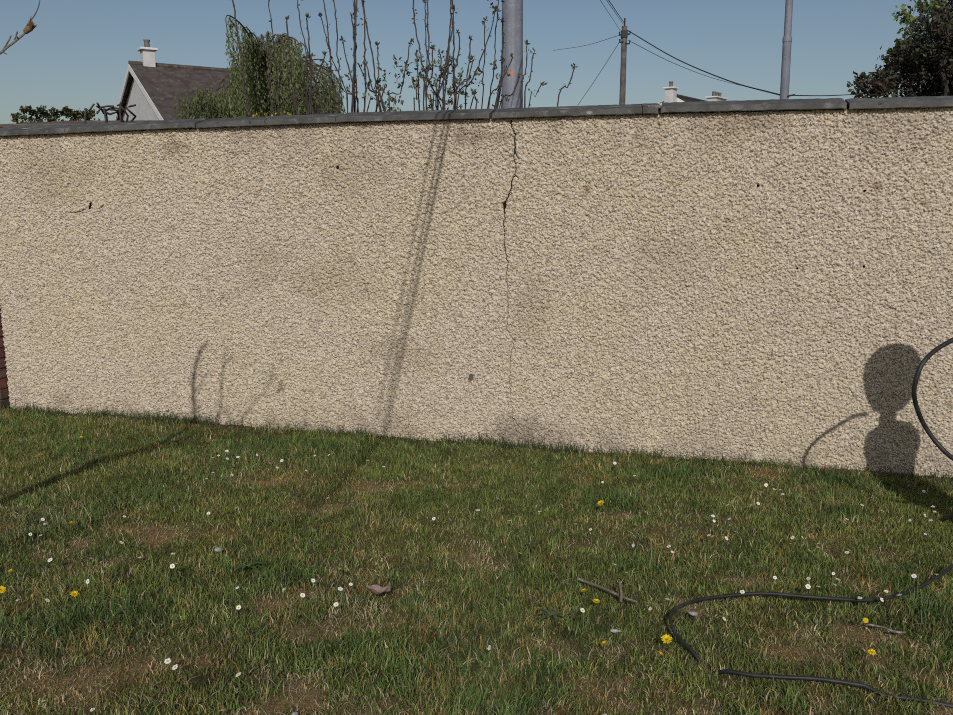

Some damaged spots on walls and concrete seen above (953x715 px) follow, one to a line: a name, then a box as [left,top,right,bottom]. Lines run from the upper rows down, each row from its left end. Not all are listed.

crack [503,120,518,432]